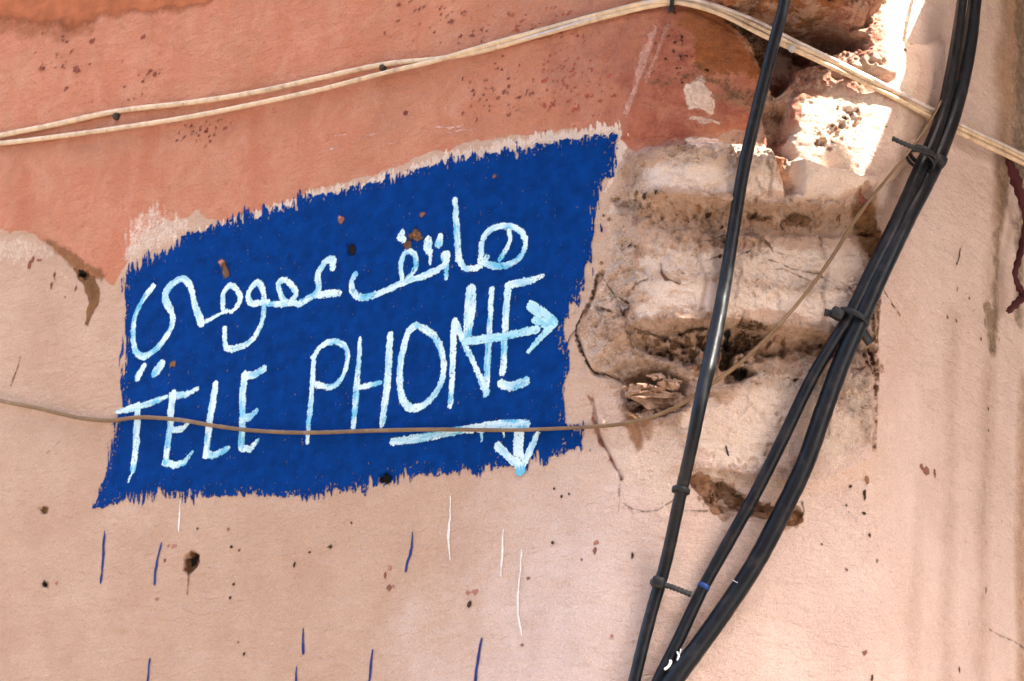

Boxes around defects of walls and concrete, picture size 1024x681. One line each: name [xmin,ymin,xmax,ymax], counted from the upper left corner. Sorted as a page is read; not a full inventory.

peeling [472,55,614,116]
spalling [579,0,897,519]
crack [568,269,680,480]
spalling [787,502,804,526]